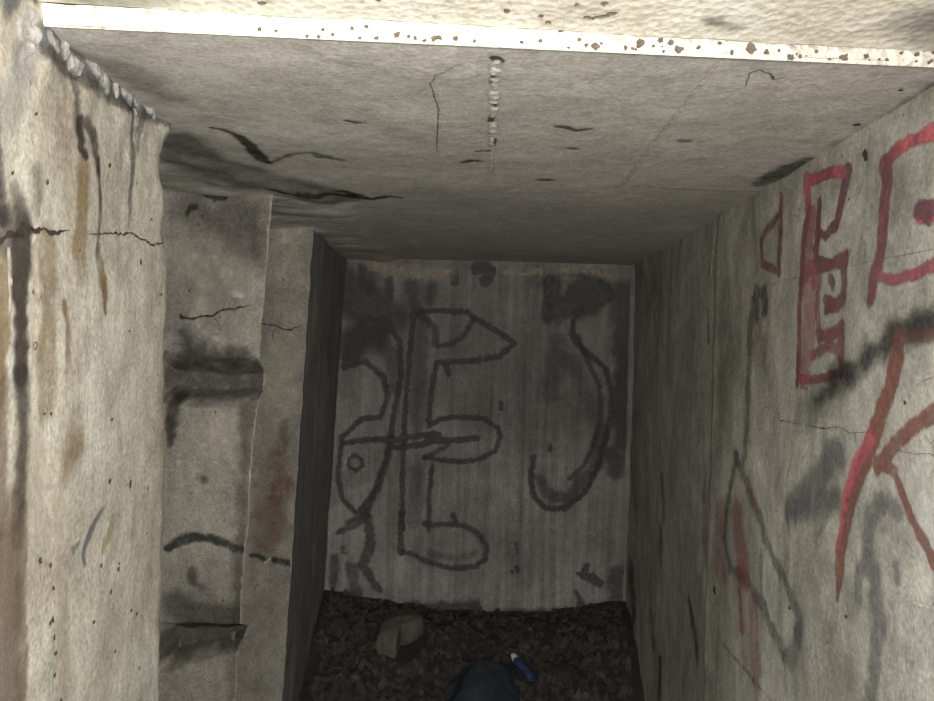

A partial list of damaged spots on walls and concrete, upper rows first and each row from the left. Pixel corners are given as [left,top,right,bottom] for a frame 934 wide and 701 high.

damp [0,173,23,304]
crack [209,127,343,164]
crack [266,189,366,200]
rust [0,290,9,406]
crack [0,223,164,492]
damp [165,340,263,445]
crack [180,305,300,342]
damp [0,391,28,701]